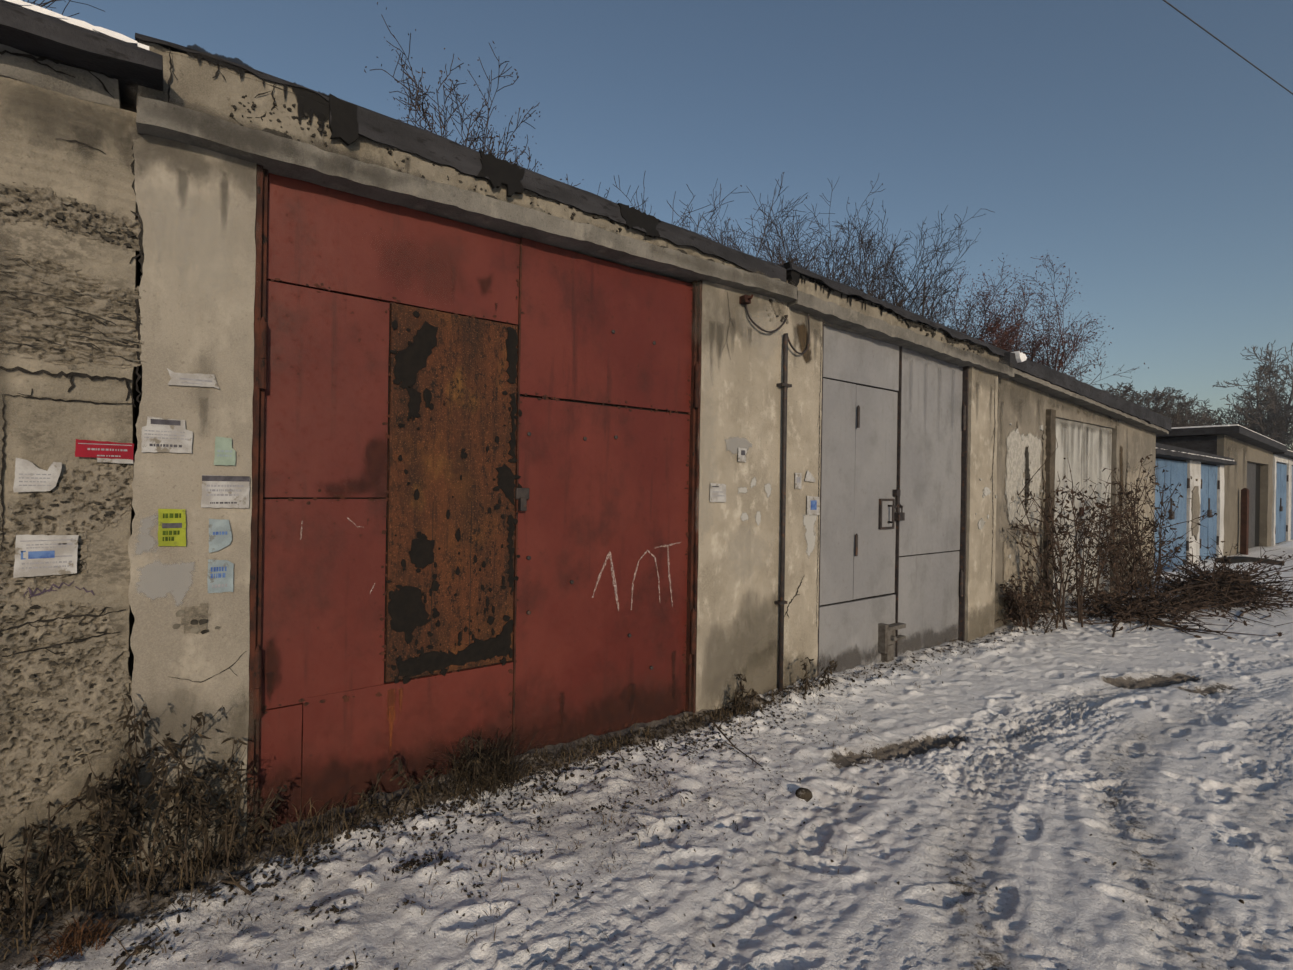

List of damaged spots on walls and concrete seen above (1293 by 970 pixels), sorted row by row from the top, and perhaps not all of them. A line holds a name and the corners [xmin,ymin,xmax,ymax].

spalling [229,93,328,151]
spalling [0,182,143,252]
crack [0,139,144,551]
spalling [0,249,146,370]
peeling [975,421,1047,615]